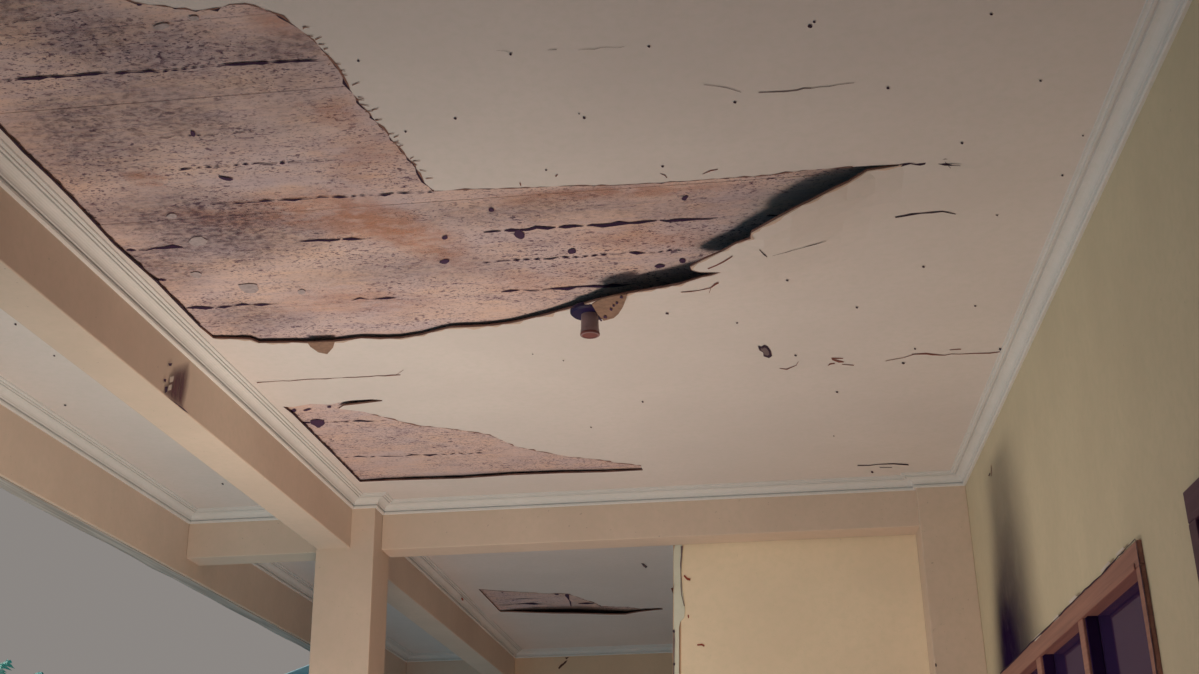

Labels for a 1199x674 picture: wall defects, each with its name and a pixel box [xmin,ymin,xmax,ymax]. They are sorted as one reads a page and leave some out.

peeling [0,0,903,354]
peeling [284,399,642,482]
peeling [479,545,685,674]